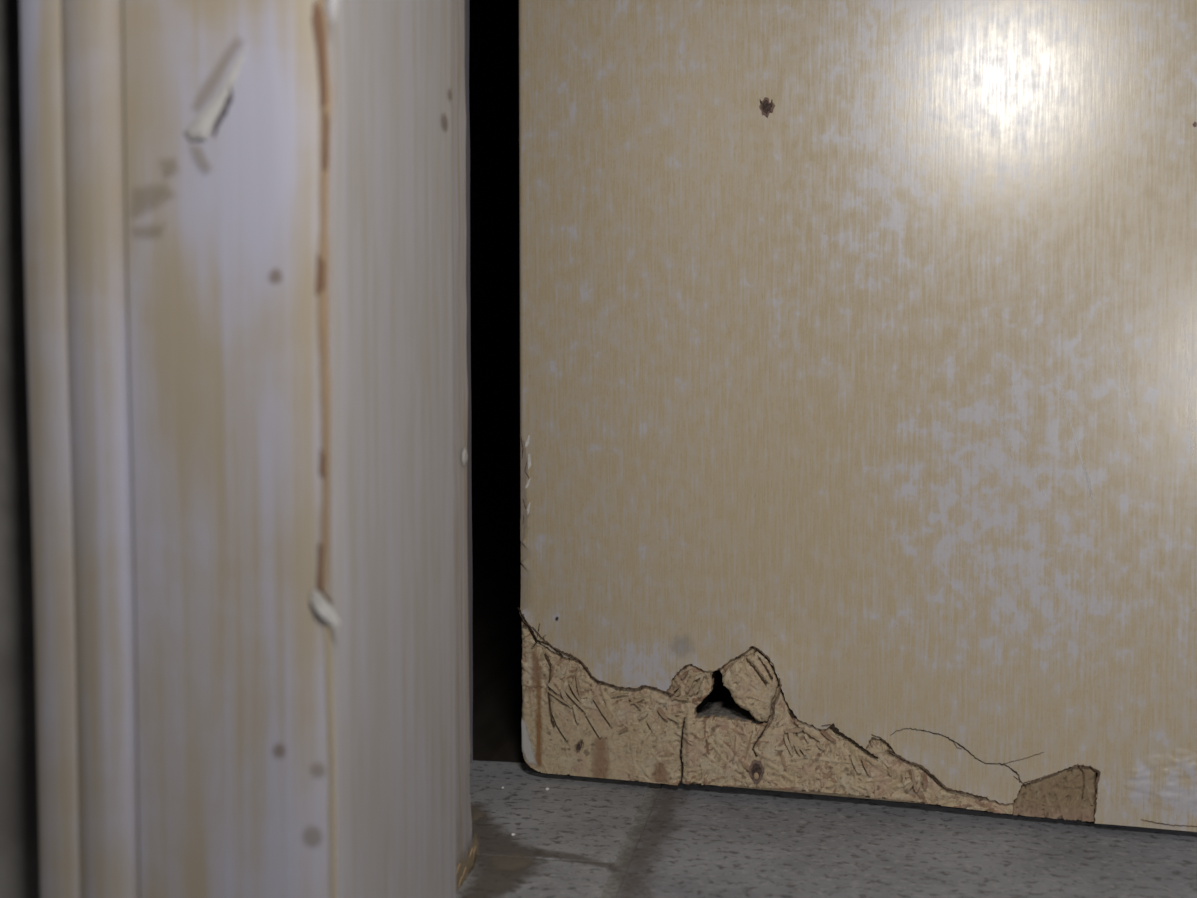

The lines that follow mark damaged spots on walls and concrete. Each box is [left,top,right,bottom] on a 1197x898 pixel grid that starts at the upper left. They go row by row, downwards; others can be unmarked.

spalling [521,619,1101,822]
crack [746,646,1044,798]